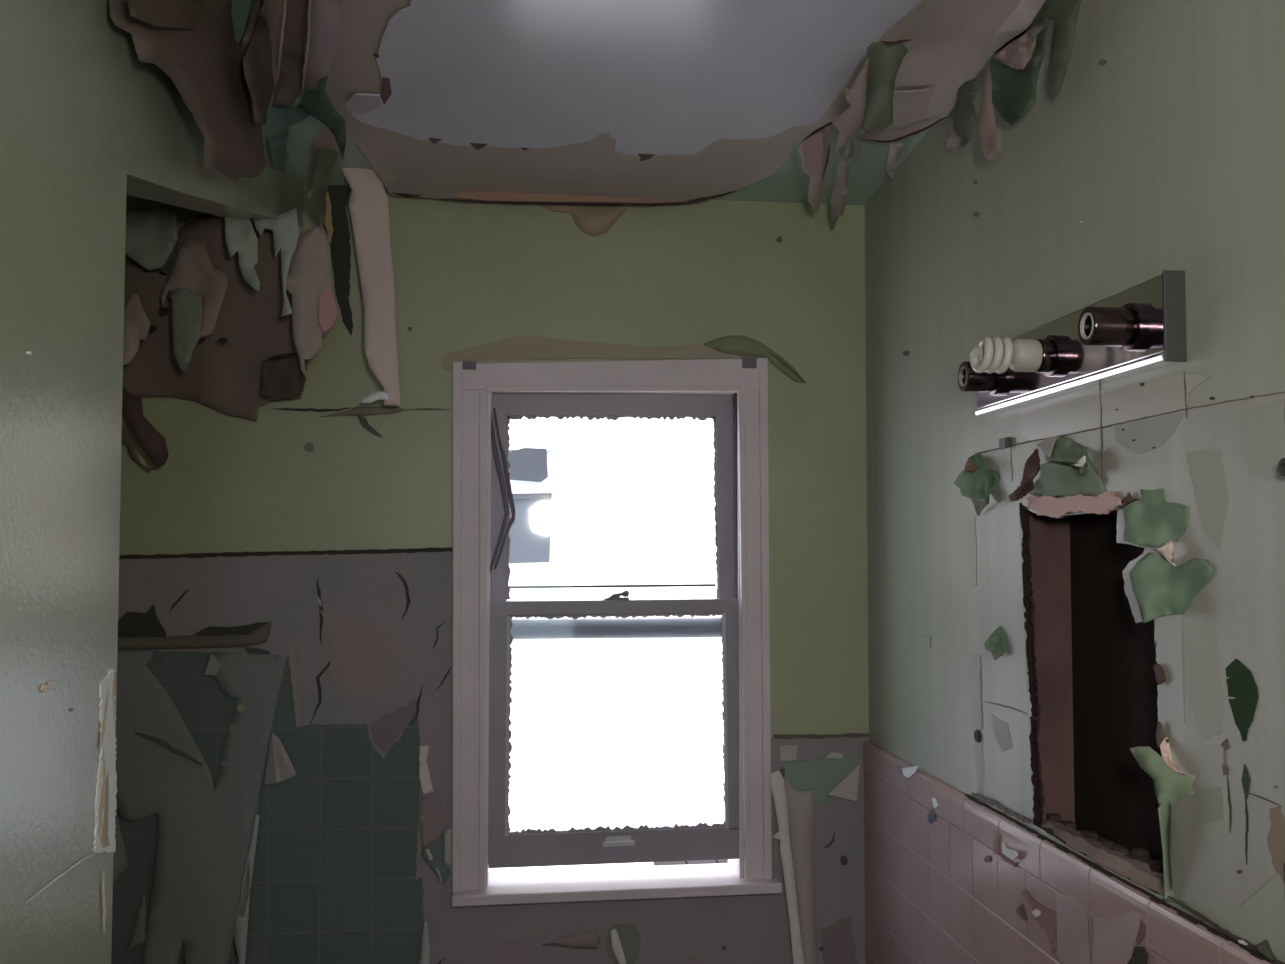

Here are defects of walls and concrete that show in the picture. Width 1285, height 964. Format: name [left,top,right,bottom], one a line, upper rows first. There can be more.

peeling [109,0,310,180]
spalling [381,77,392,104]
peeling [321,168,405,417]
crack [310,579,331,724]
crack [396,572,411,619]
crack [408,622,451,725]
peeling [979,393,1285,906]
spalling [93,669,117,853]
peeling [927,798,938,823]